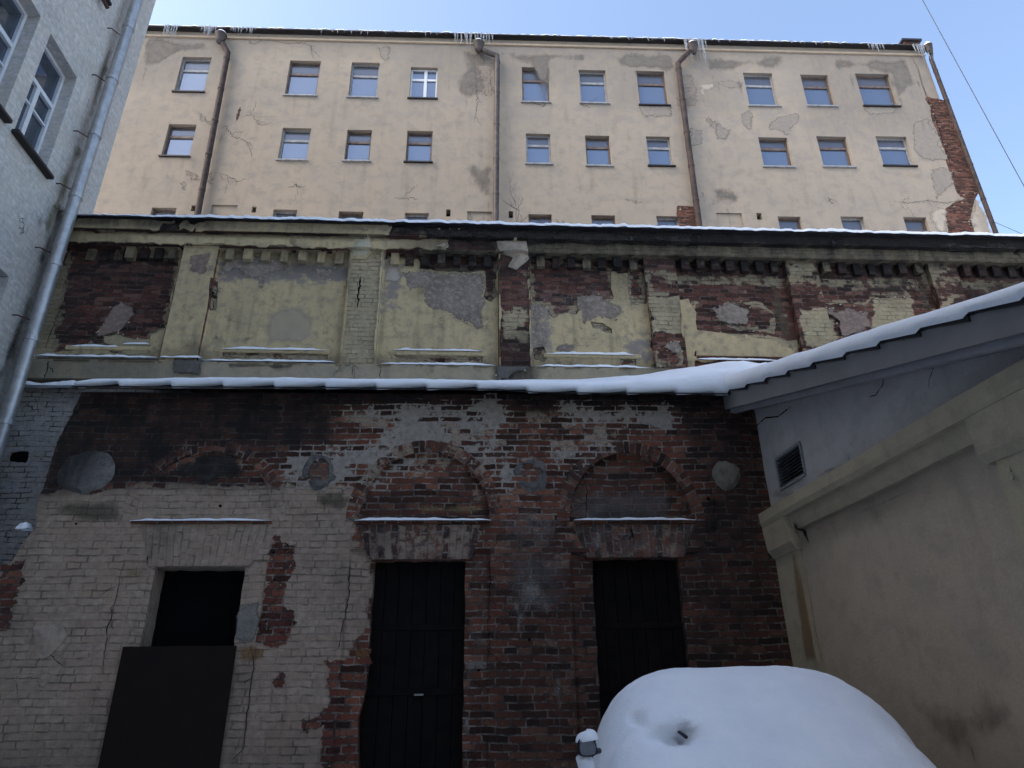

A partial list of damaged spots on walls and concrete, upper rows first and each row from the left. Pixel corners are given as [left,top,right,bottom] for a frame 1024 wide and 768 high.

water stain [460,53,491,95]
spalling [913,97,992,233]
spalling [51,225,218,355]
peeling [383,228,498,329]
spalling [530,256,672,333]
crack [102,568,122,669]
spalling [256,534,296,648]
crack [332,567,351,651]
spalling [301,647,373,768]